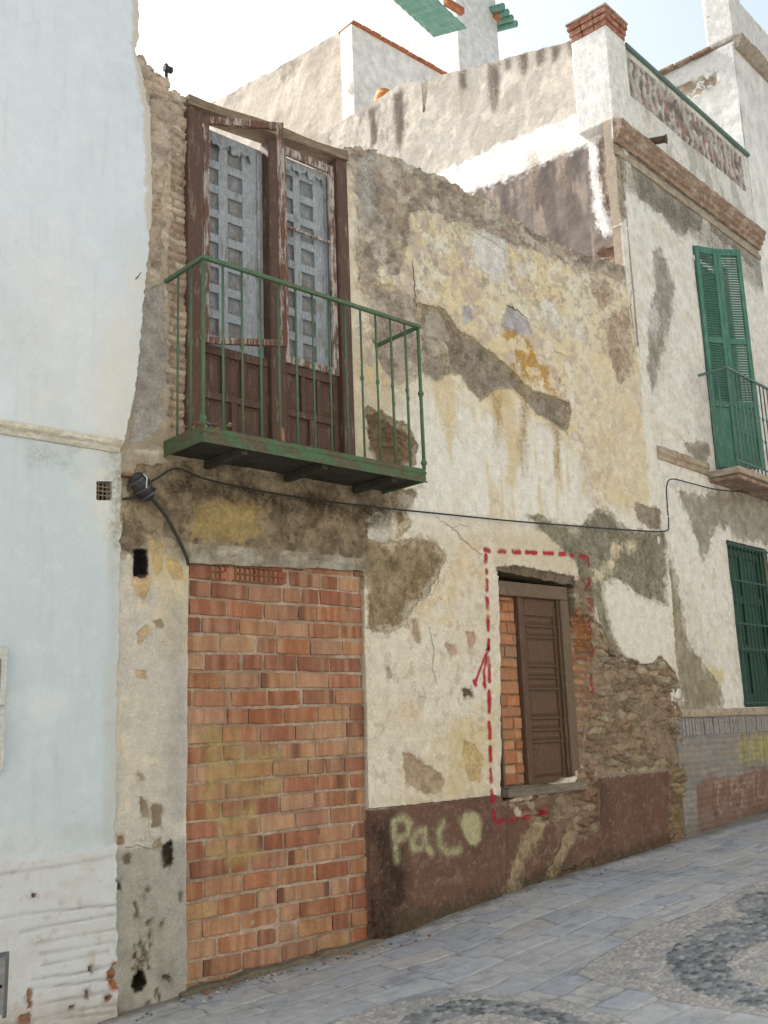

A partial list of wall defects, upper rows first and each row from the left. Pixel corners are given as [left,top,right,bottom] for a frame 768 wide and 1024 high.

leakage [487,41,572,108]
leakage [393,90,403,147]
flaking render [137,54,188,428]
flaking render [344,145,634,385]
flaking render [646,249,675,390]
flaking render [365,407,418,466]
flaking render [679,487,768,559]
flaking render [412,619,421,643]
peeling [496,503,724,709]
flaking render [569,615,591,747]
flaking render [402,752,445,795]
spalling [131,902,162,970]